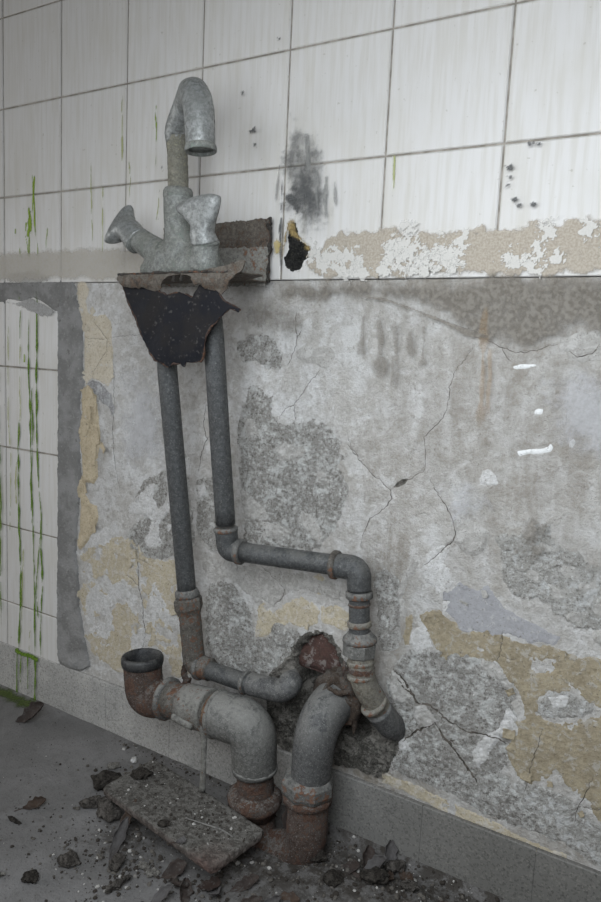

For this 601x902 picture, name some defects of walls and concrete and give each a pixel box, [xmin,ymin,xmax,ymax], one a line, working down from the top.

water stain [276,133,336,220]
water stain [288,216,601,344]
spalling [237,332,283,370]
spalling [77,281,189,678]
spalling [237,384,349,551]
crack [347,341,549,565]
spalling [480,469,498,486]
spalling [517,444,553,456]
spalling [185,454,349,753]
spalling [495,522,601,630]
crack [393,669,506,782]
spalling [333,545,601,866]